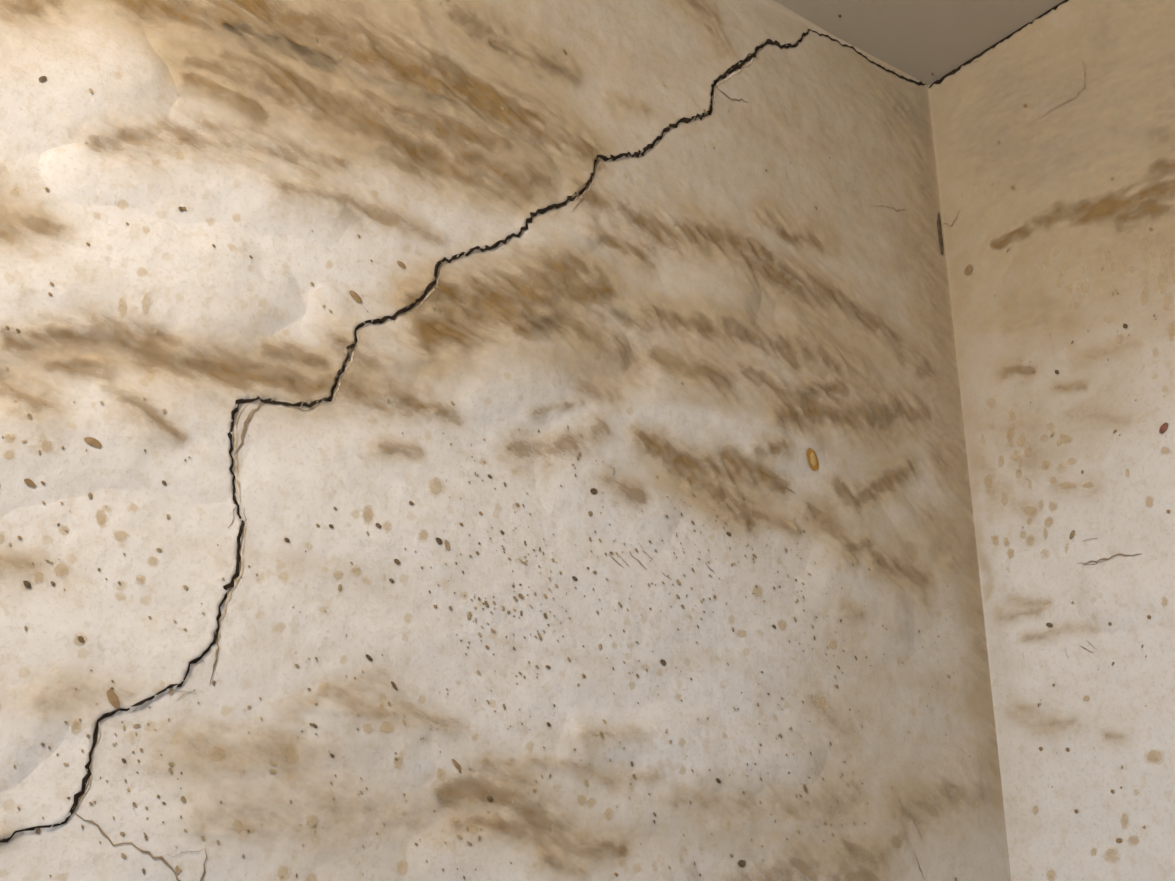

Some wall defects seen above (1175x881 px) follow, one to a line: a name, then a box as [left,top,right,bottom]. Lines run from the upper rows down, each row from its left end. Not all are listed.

damp [111,0,213,30]
damp [275,2,347,40]
damp [182,73,268,125]
damp [362,90,511,154]
damp [318,193,441,241]
damp [601,235,653,267]
damp [404,278,461,313]
damp [46,358,109,378]
damp [649,346,791,397]
damp [119,396,185,440]
crack [0,29,925,881]
damp [686,473,795,533]